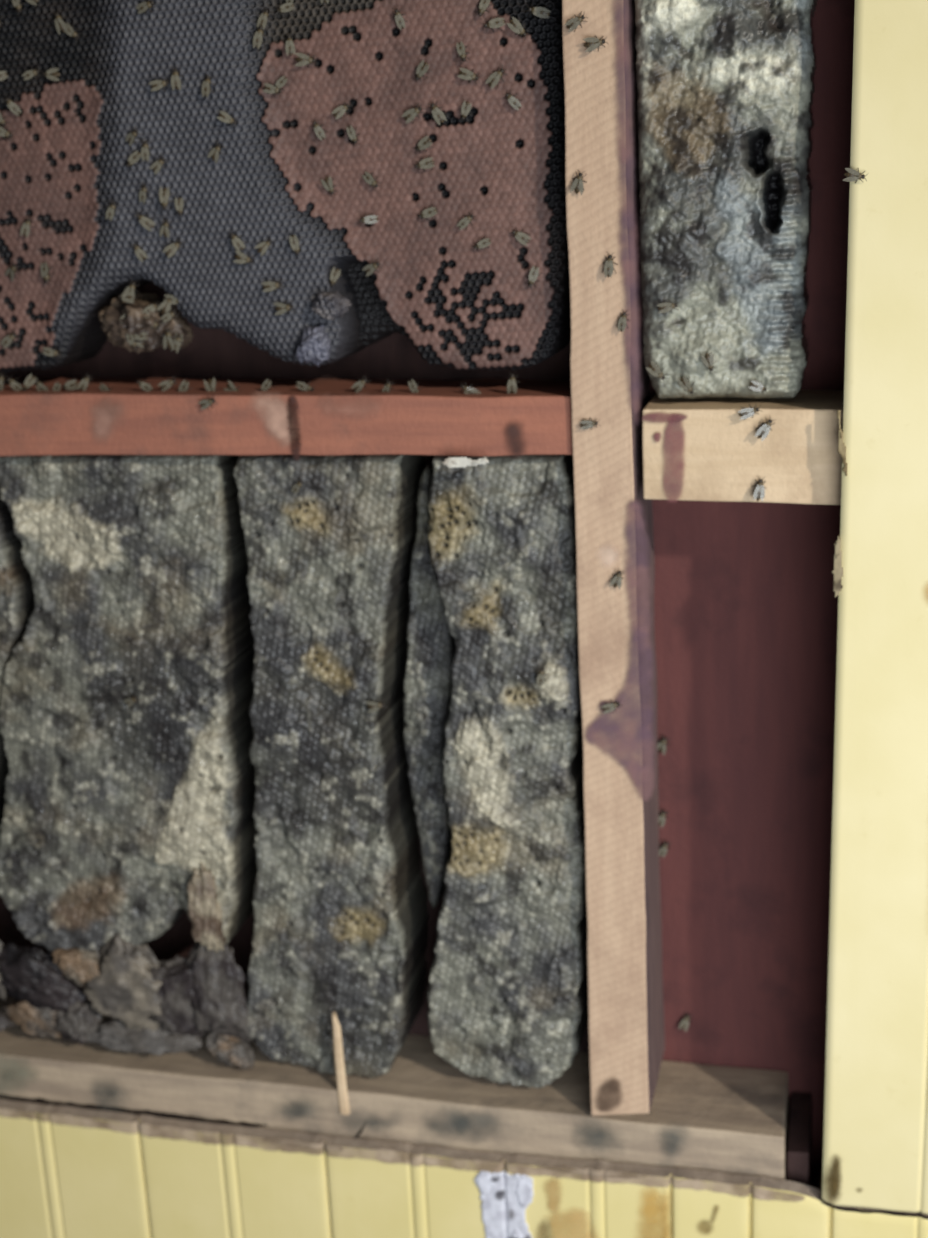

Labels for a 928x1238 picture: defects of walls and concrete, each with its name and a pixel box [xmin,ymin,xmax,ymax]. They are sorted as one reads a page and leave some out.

spalling [0,1108,804,1238]
water stain [539,1181,592,1238]